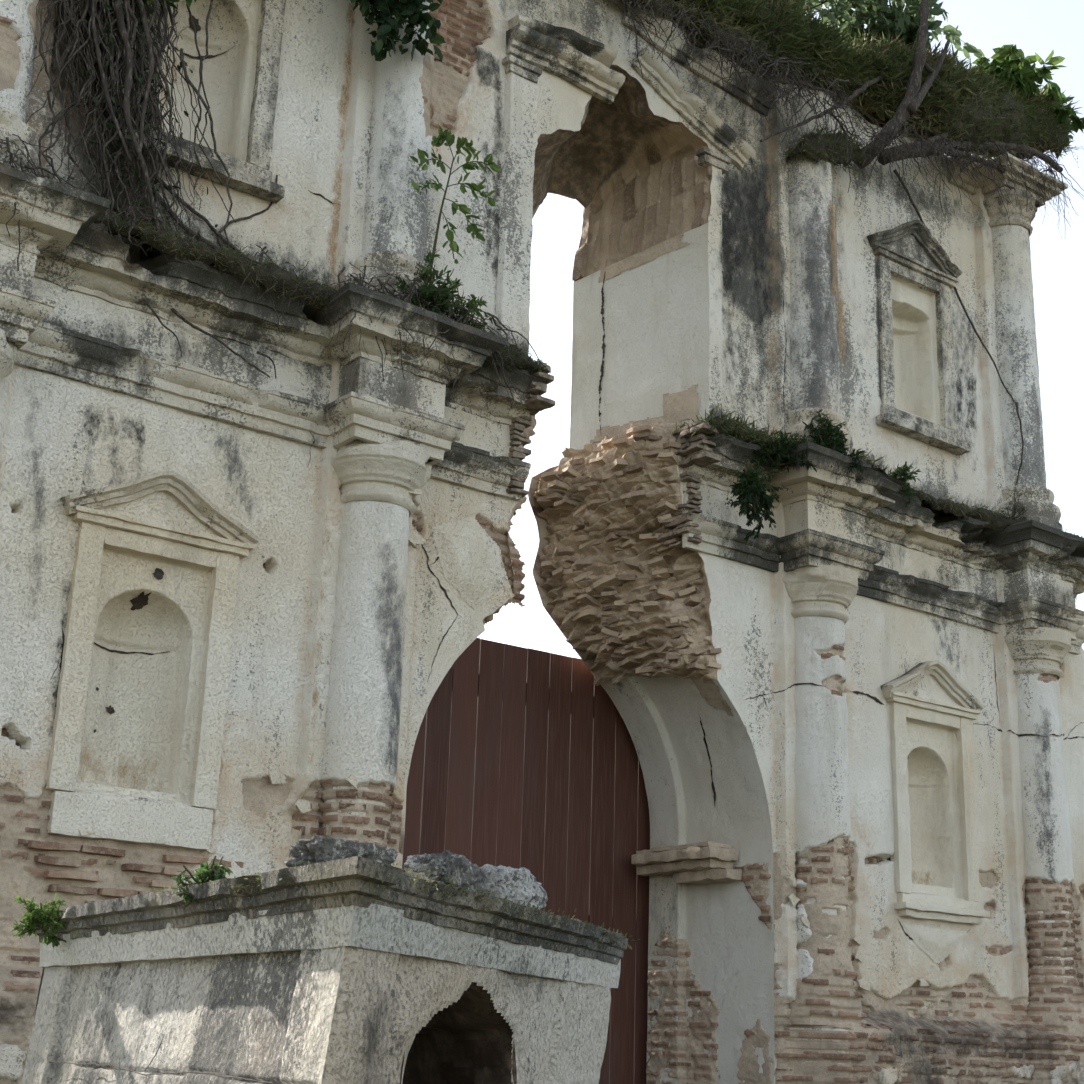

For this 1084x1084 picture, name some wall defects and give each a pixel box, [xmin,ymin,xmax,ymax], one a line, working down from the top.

spalling [419,0,491,141]
water stain [723,159,770,289]
crack [598,274,606,431]
spalling [475,361,734,717]
spalling [241,770,403,854]
water stain [377,545,404,772]
crack [421,544,458,682]
crack [700,718,716,806]
crack [745,683,884,709]
crack [980,645,1084,740]
spalling [0,783,216,1084]
spalling [734,837,1084,1084]